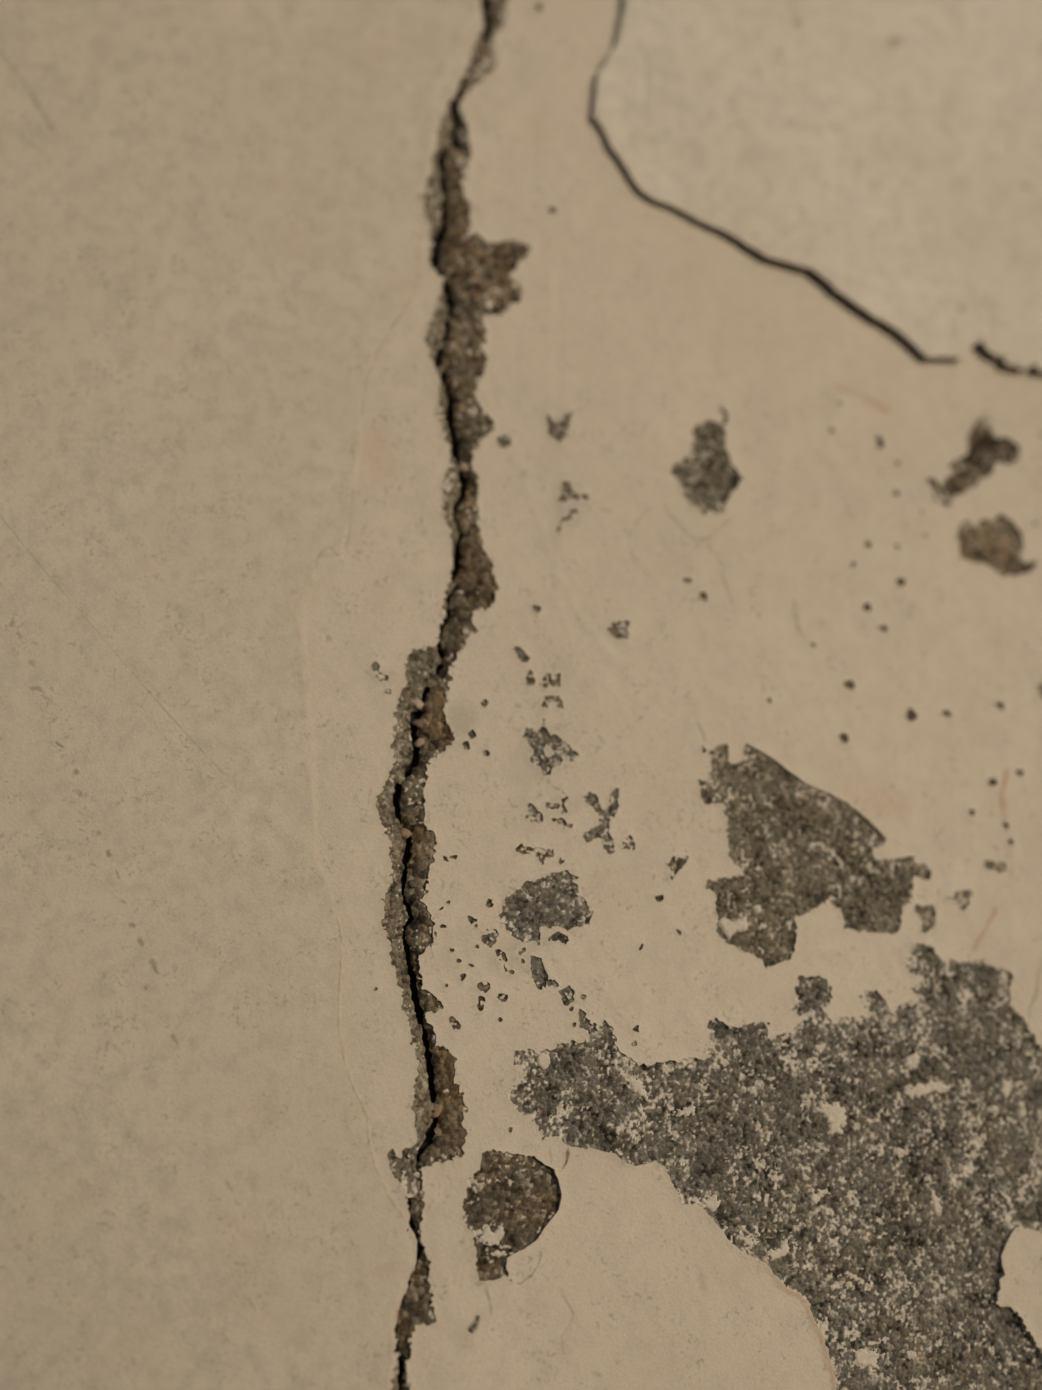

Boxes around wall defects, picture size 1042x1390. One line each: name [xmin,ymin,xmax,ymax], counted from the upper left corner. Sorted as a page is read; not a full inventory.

peeling [593,0,1042,371]
spalling [671,405,743,515]
spalling [927,411,1020,507]
spalling [957,515,1037,577]
crack [376,0,531,1390]
peeling [514,647,578,776]
spalling [477,744,1042,1390]
spalling [462,1149,560,1281]